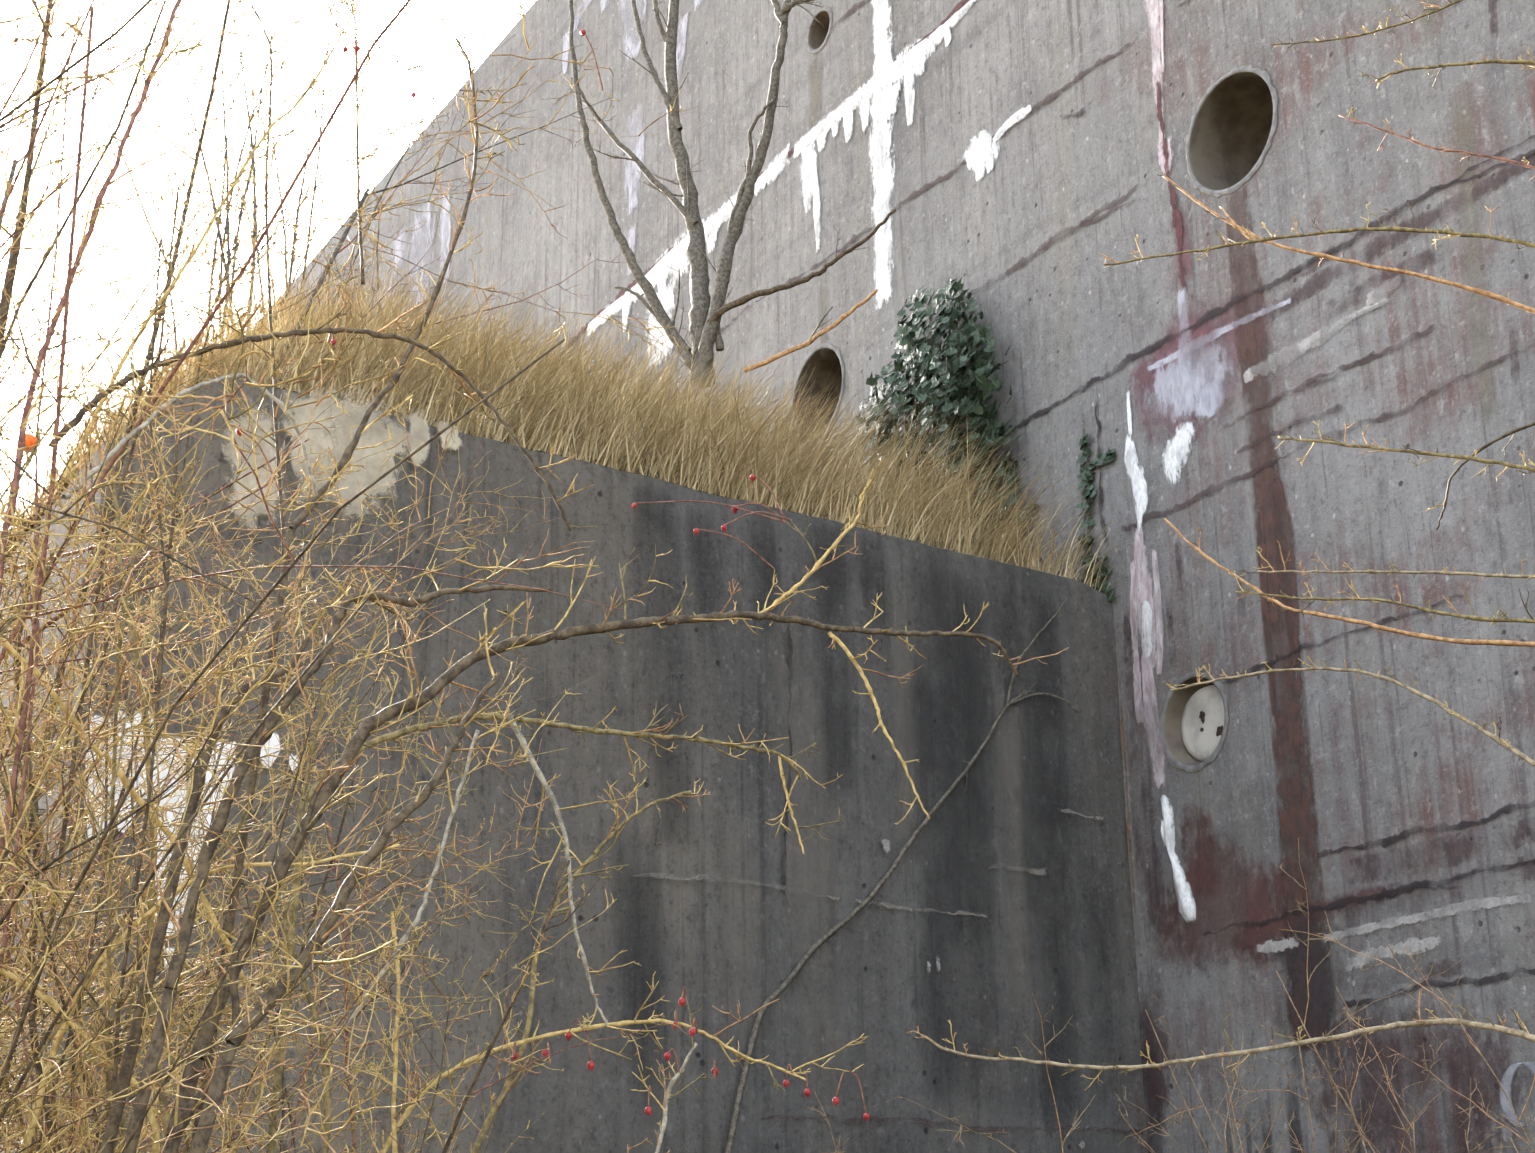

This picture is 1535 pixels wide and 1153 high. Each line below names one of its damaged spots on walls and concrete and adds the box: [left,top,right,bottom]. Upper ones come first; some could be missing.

rust [1476,153,1535,195]
rust [1133,296,1210,438]
rust [1124,616,1143,691]
rust [1149,187,1516,1153]
rust [1140,1017,1168,1116]